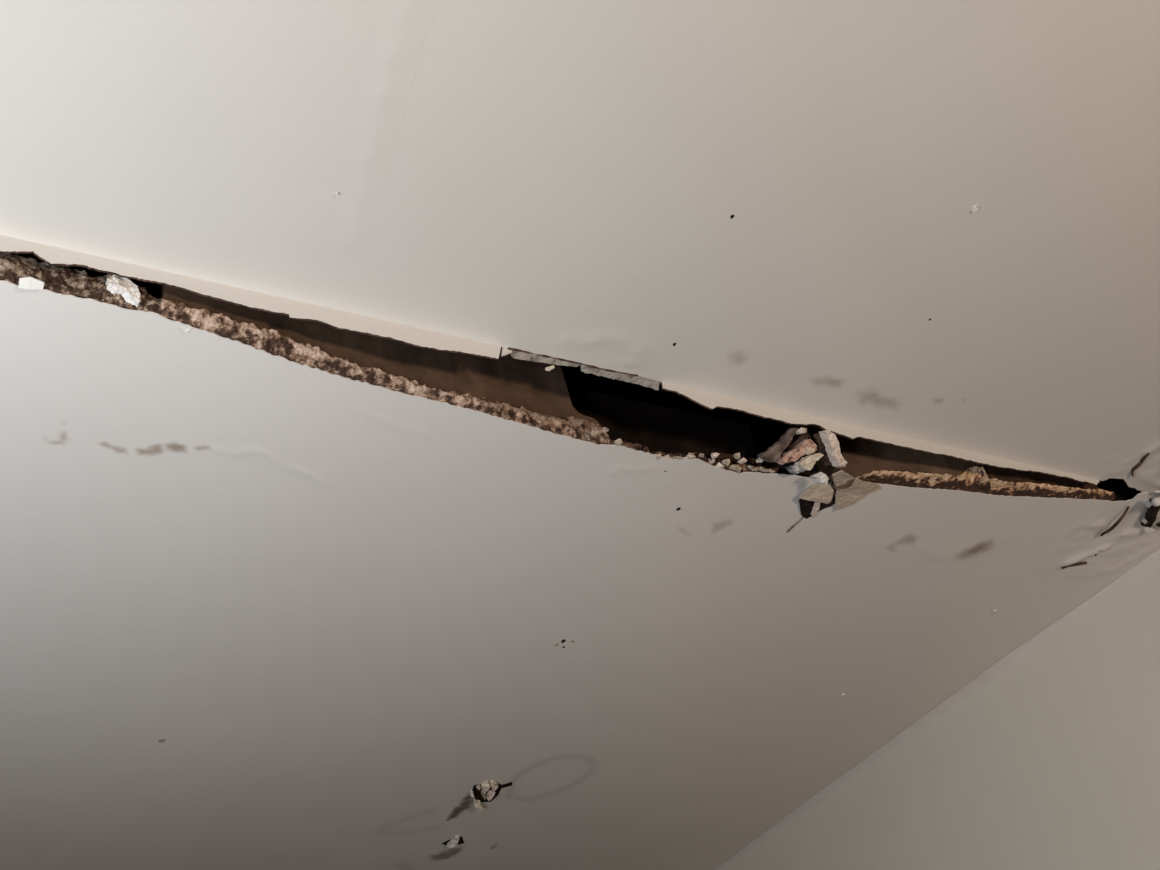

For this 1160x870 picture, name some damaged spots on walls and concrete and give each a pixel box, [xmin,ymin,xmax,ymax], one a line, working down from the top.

flaking render [0,253,798,474]
peeling [829,433,1160,586]
flaking render [442,835,464,848]
flaking render [450,780,512,819]